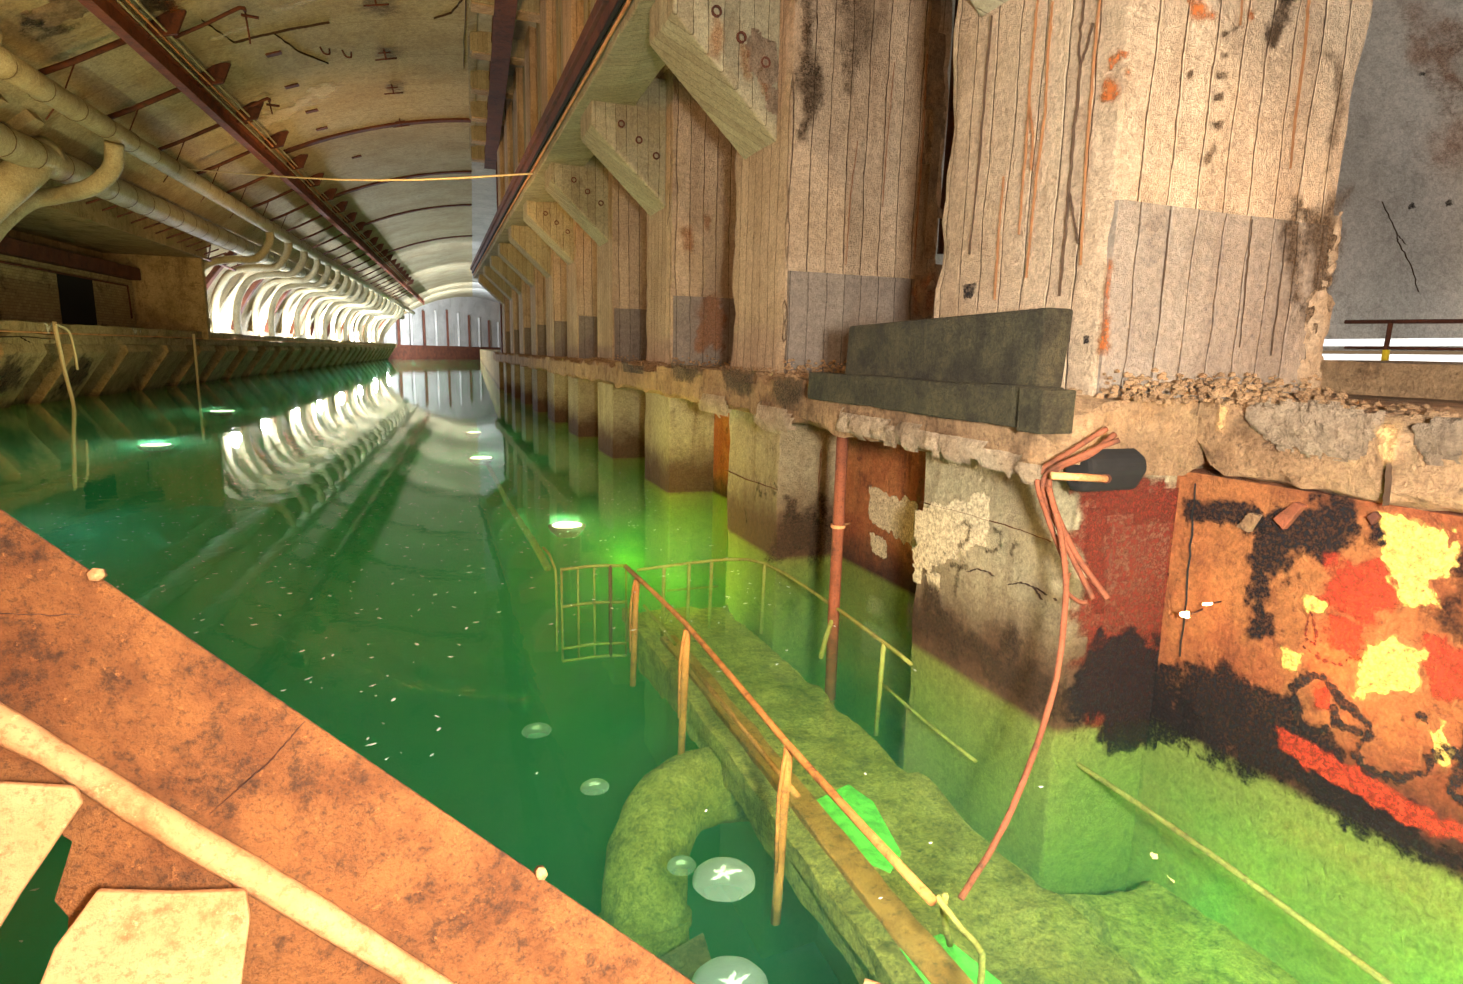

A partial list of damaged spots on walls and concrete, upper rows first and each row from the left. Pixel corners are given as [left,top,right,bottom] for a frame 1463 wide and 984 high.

water stain [21,13,79,42]
water stain [795,0,823,140]
water stain [1265,0,1293,47]
spalling [1245,211,1386,462]
spalling [1412,416,1463,466]
peeling [868,487,990,591]